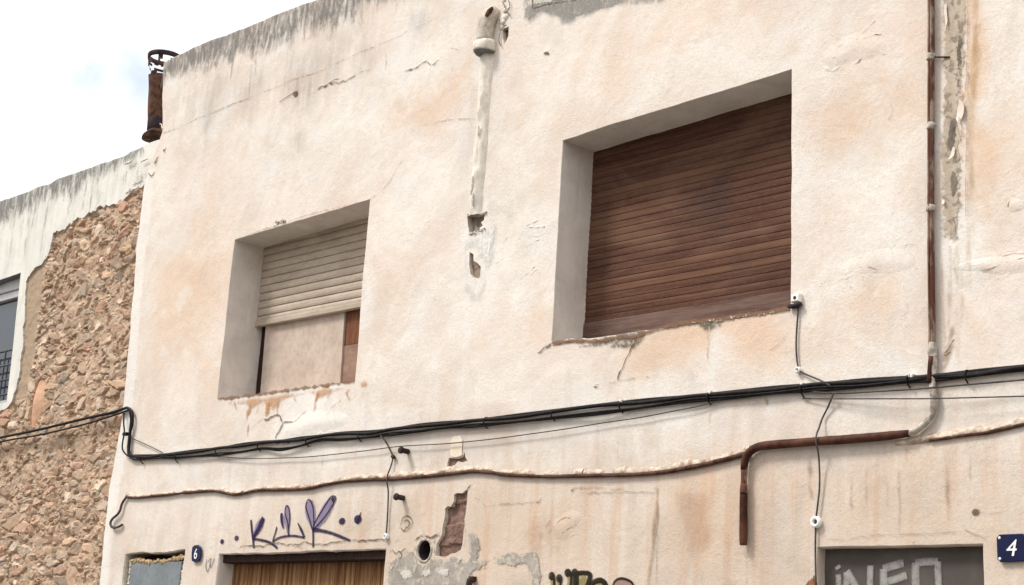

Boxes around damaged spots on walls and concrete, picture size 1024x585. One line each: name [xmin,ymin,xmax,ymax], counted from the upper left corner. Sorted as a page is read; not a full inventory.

water stain [163,0,368,77]
flaking render [524,0,646,22]
crack [317,74,355,90]
peeling [939,0,966,239]
water stain [0,148,141,223]
spalling [465,210,495,297]
flaking render [0,184,145,585]
rust [234,395,289,416]
crack [218,381,354,438]
crack [538,338,588,353]
crack [594,341,635,388]
peeling [387,490,541,585]